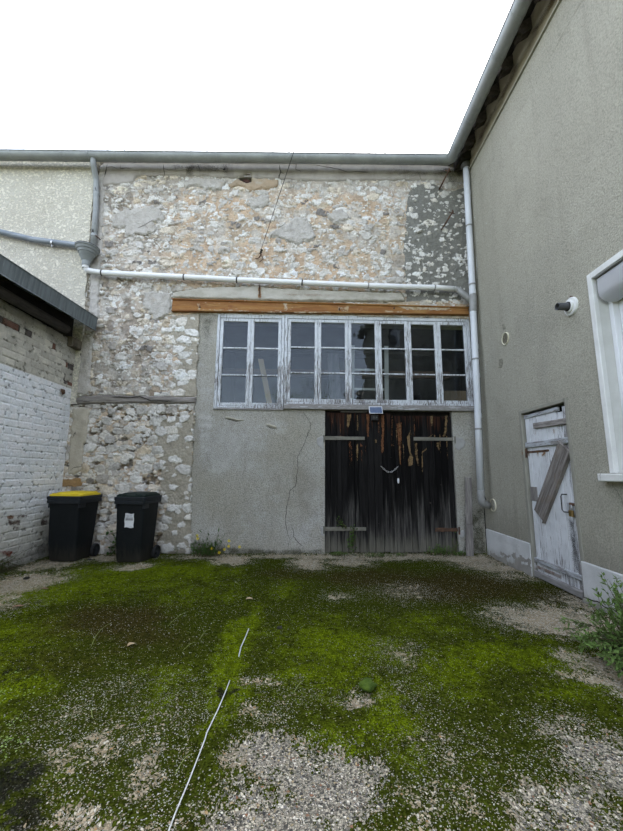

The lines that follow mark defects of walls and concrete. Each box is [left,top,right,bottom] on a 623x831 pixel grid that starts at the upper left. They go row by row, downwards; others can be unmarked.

crack [285,418,311,546]